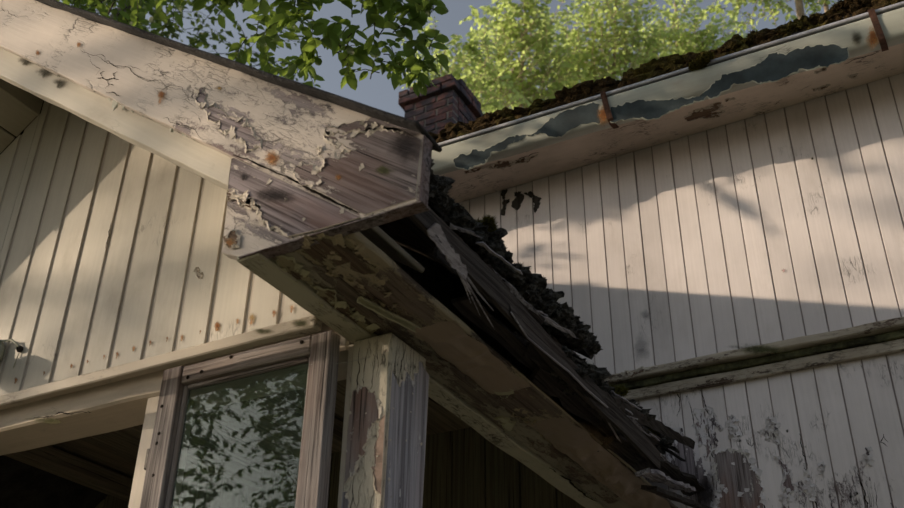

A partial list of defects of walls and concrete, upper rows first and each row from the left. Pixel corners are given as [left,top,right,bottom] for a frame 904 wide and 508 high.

peeling [453,43,849,174]
crack [233,154,365,215]
peeling [194,87,422,335]
peeling [344,360,429,508]
peeling [665,405,767,508]
peeling [760,416,826,508]